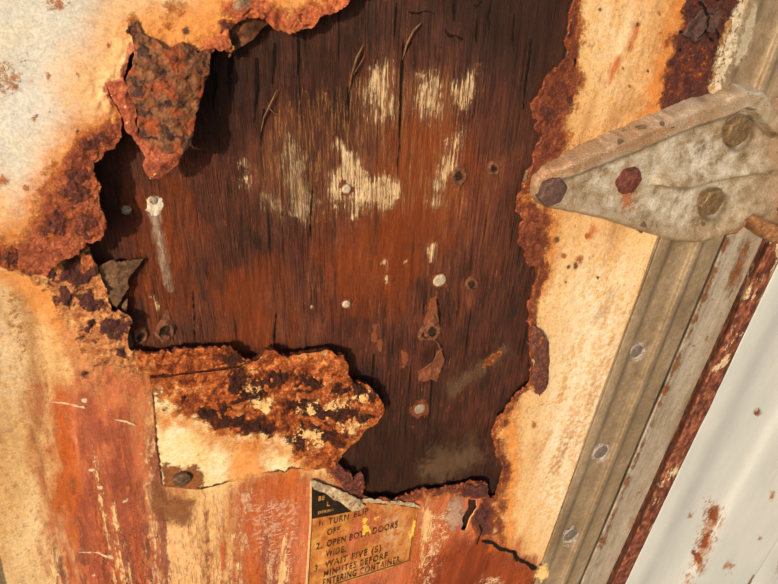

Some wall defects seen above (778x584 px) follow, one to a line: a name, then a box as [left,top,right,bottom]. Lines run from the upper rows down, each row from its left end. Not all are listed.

peeling [107,20,211,179]
rust [637,0,741,120]
rust [0,0,586,584]
peeling [370,323,383,352]
peeling [482,351,503,367]
rust [687,238,730,338]
rust [728,240,750,293]
peeling [140,433,307,584]
crack [476,524,537,571]
rust [685,500,723,584]